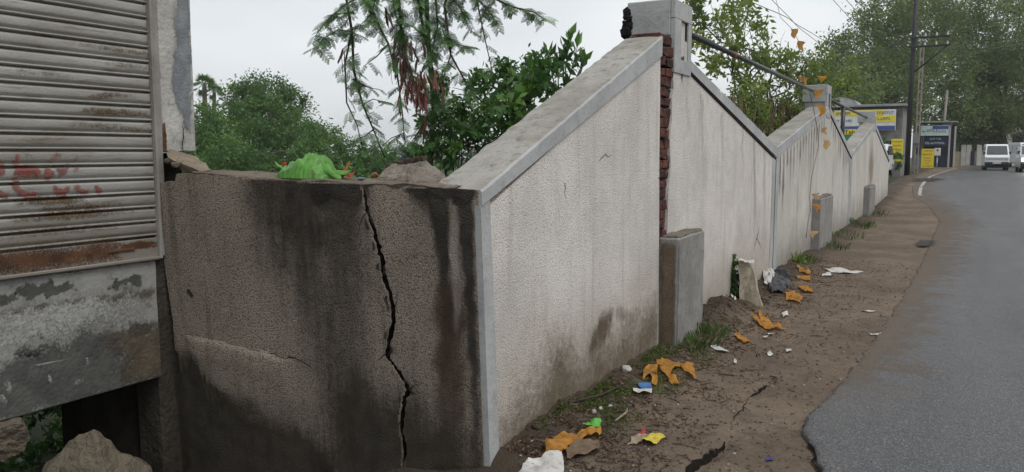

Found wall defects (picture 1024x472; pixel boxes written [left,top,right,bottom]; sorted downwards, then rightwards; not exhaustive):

corrosion [0,196,157,275]
peeling [0,274,161,419]
water stain [177,180,479,472]
crack [359,189,414,461]